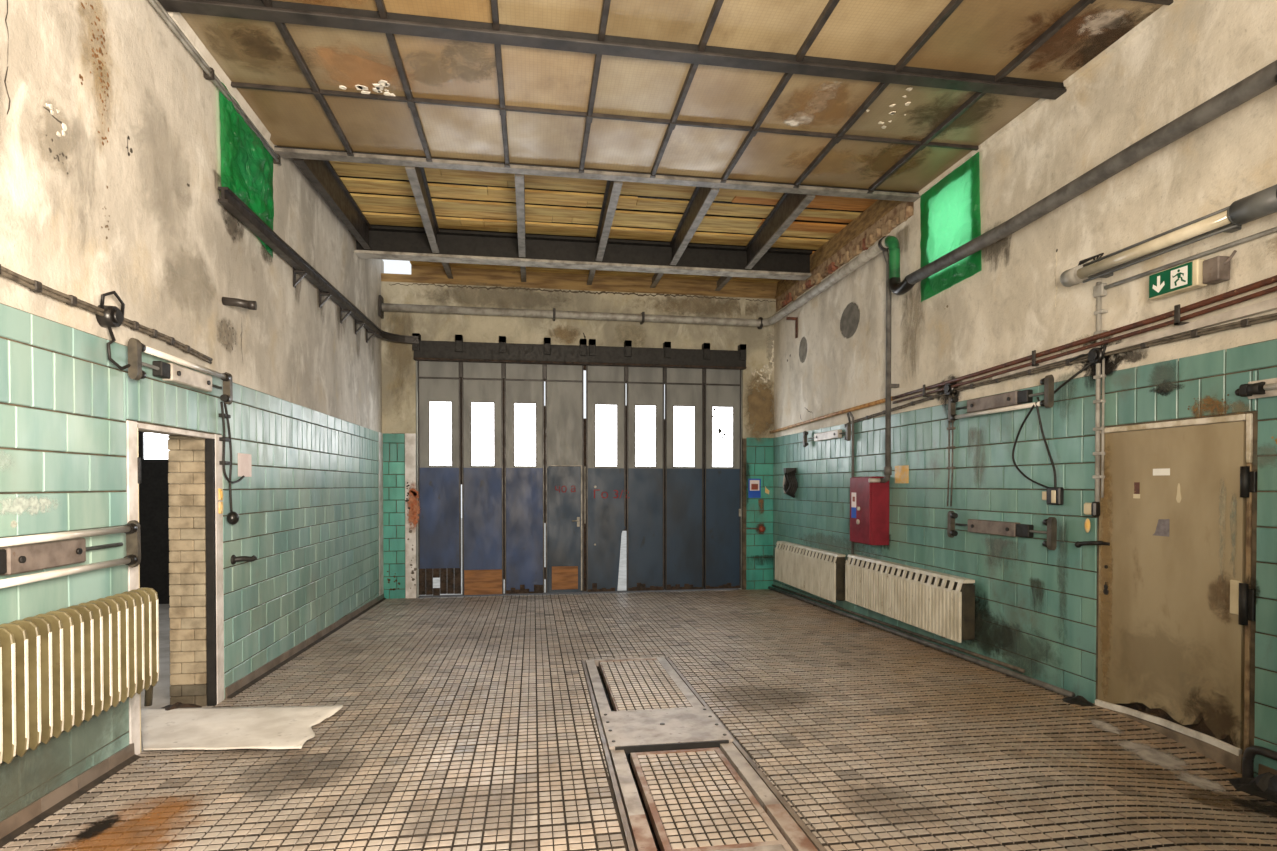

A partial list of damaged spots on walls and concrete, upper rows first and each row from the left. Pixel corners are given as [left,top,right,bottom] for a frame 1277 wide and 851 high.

crack [3,0,11,115]
rust [81,2,110,146]
water stain [1020,9,1138,70]
flaking render [43,103,68,175]
water stain [1154,380,1179,396]
water stain [1030,579,1043,609]
water stain [973,595,1050,674]
rust [58,801,192,851]